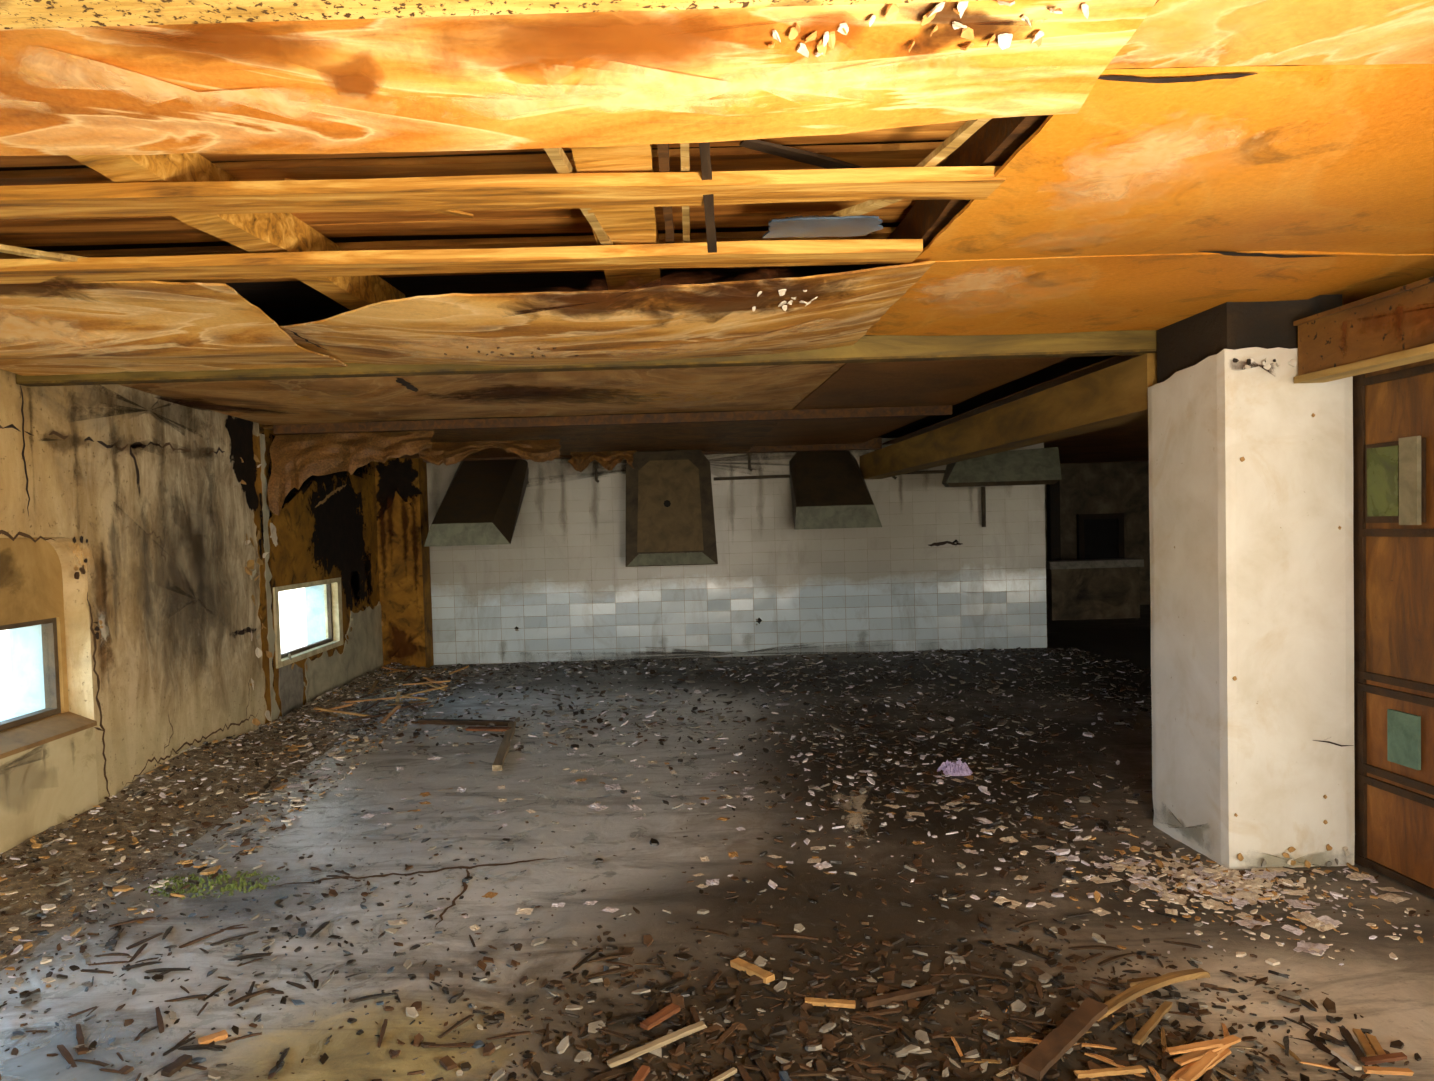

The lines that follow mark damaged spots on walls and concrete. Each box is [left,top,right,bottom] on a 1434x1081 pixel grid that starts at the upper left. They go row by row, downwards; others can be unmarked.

leakage [472,14,876,118]
peeling [768,15,876,58]
crack [1098,73,1258,83]
crack [1199,250,1329,258]
leakage [519,271,843,354]
leakage [259,493,273,614]
leakage [351,498,418,607]
leakage [387,622,418,659]